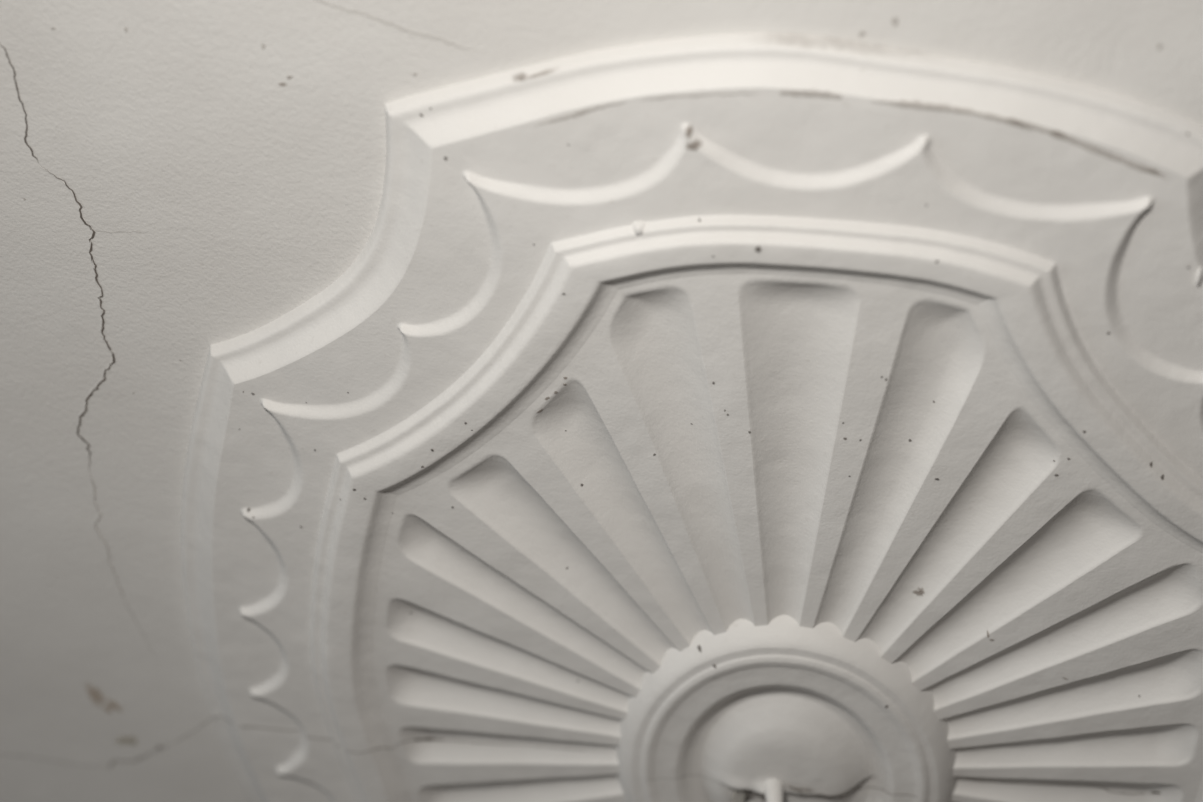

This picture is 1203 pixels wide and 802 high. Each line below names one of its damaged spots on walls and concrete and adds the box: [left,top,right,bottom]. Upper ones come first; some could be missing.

crack [4,48,128,606]